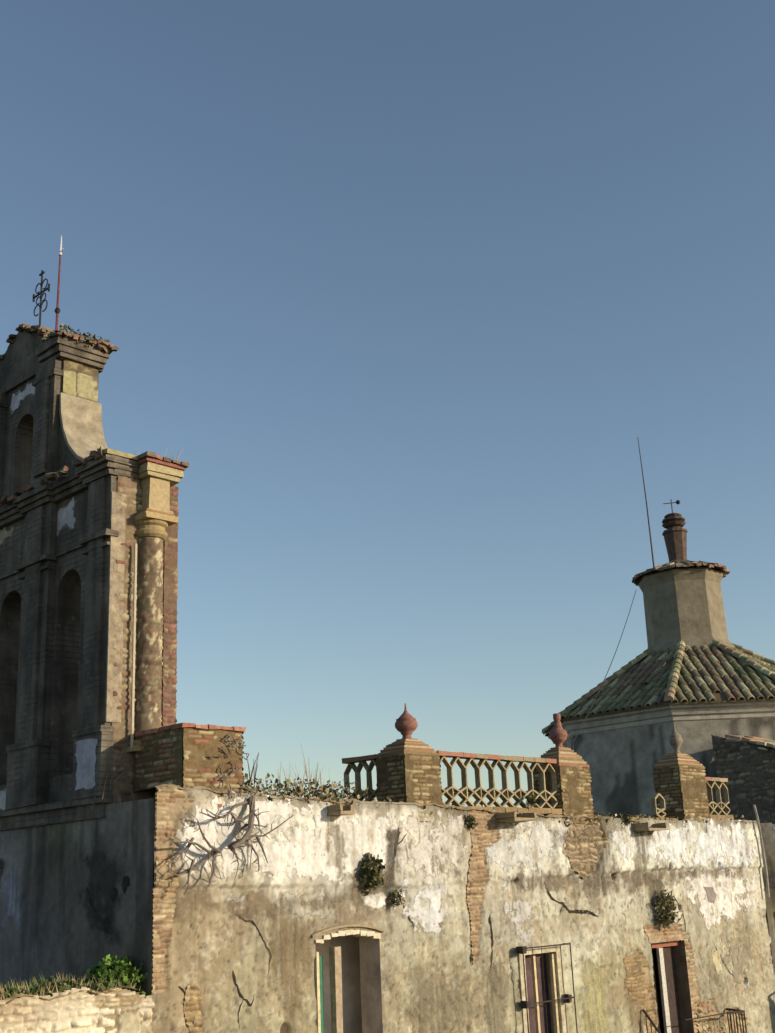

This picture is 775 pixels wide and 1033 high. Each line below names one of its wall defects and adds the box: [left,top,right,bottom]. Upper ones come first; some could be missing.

peeling [152,787,760,995]
crack [235,914,272,973]
spalling [183,984,203,1033]
crack [233,971,255,1026]
flaking render [624,923,750,1033]